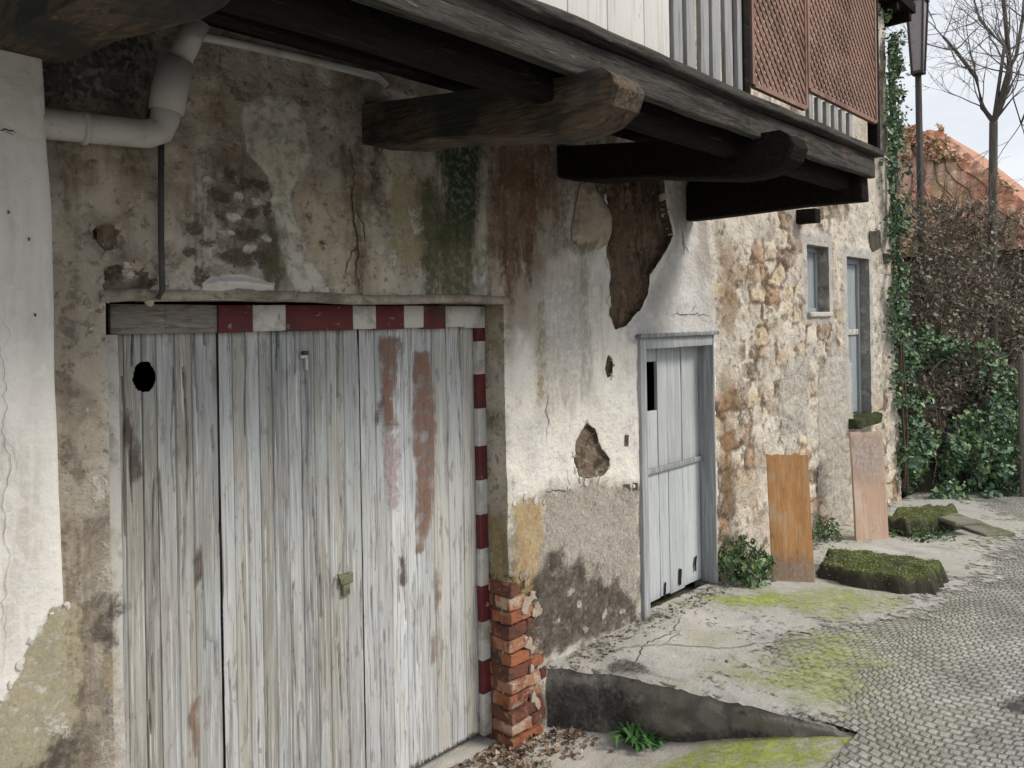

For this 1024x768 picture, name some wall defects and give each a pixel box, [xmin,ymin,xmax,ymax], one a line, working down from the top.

spalling [89,222,159,307]
crack [345,148,366,291]
leakage [342,146,482,303]
spalling [585,180,673,329]
spalling [486,419,640,750]
leakage [527,551,639,657]
crack [592,618,832,675]